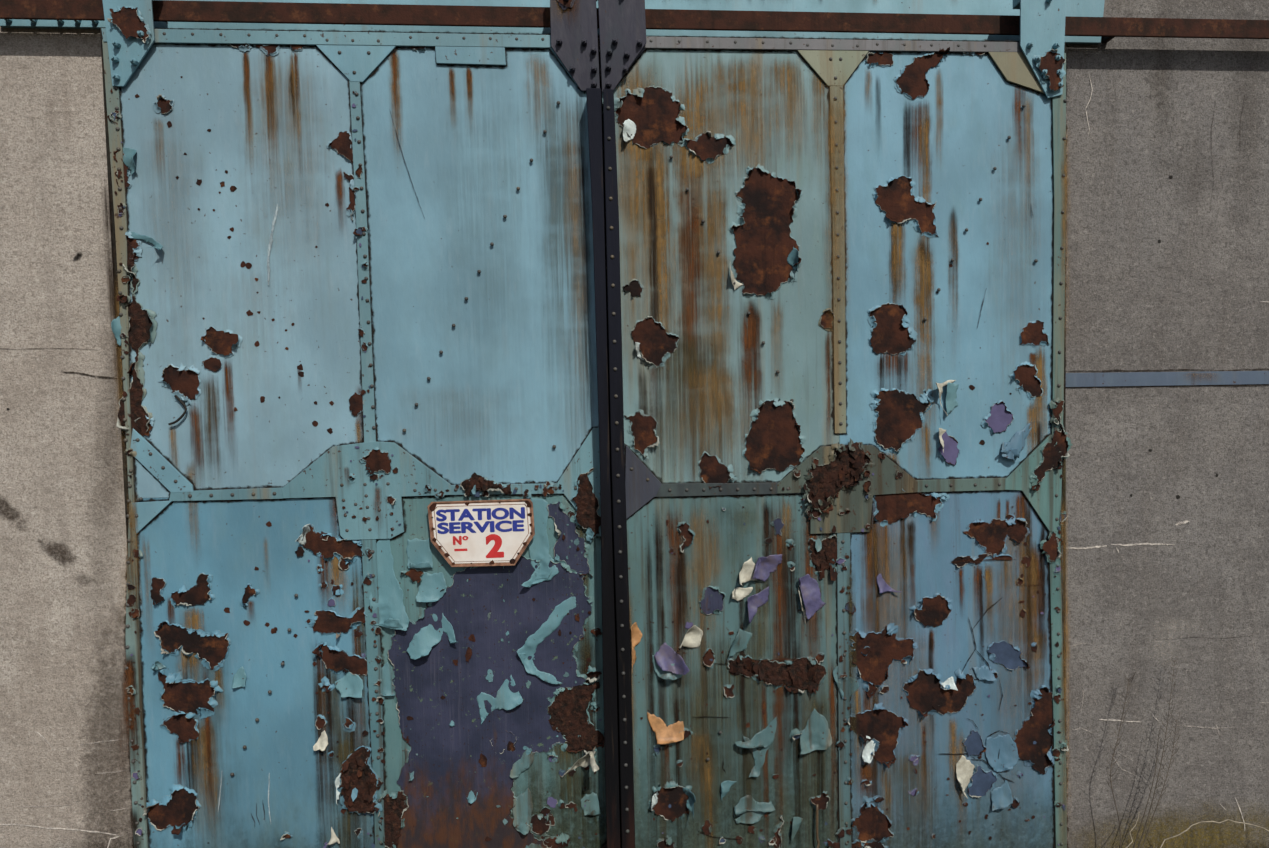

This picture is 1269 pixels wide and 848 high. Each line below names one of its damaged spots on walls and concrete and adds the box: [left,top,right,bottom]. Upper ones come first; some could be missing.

rust [619,139,658,258]
rust [673,63,798,280]
rust [814,74,842,263]
rust [949,213,957,267]
rust [1015,88,1030,155]
damp [0,499,19,520]
damp [44,543,73,562]
peeling [295,386,605,848]
rust [648,505,854,846]
peeling [614,47,1073,848]
rust [865,518,879,617]
rust [997,495,1045,658]